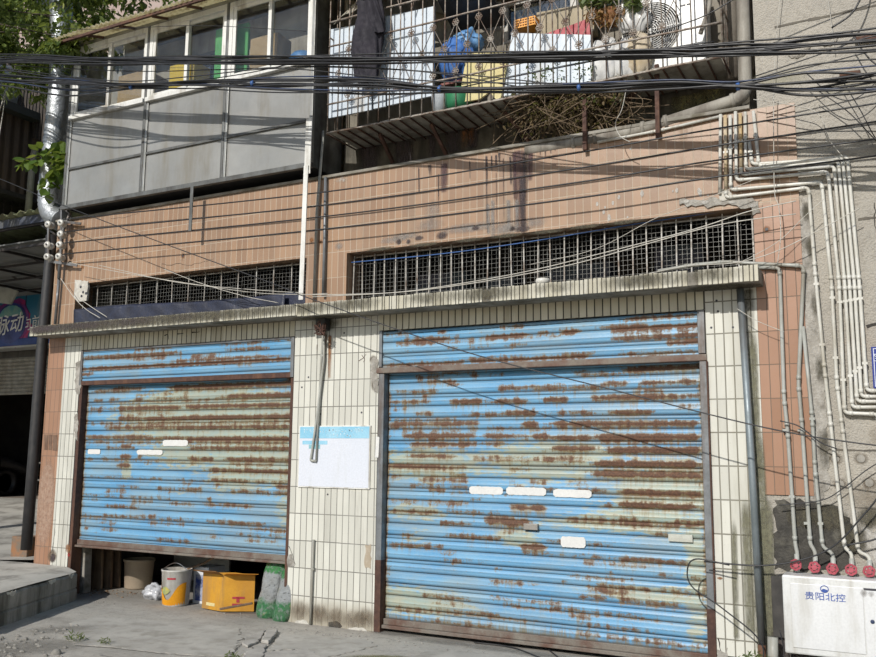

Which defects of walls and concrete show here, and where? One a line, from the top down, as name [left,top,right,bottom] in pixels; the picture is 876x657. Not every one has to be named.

spalling [773,198,876,573]